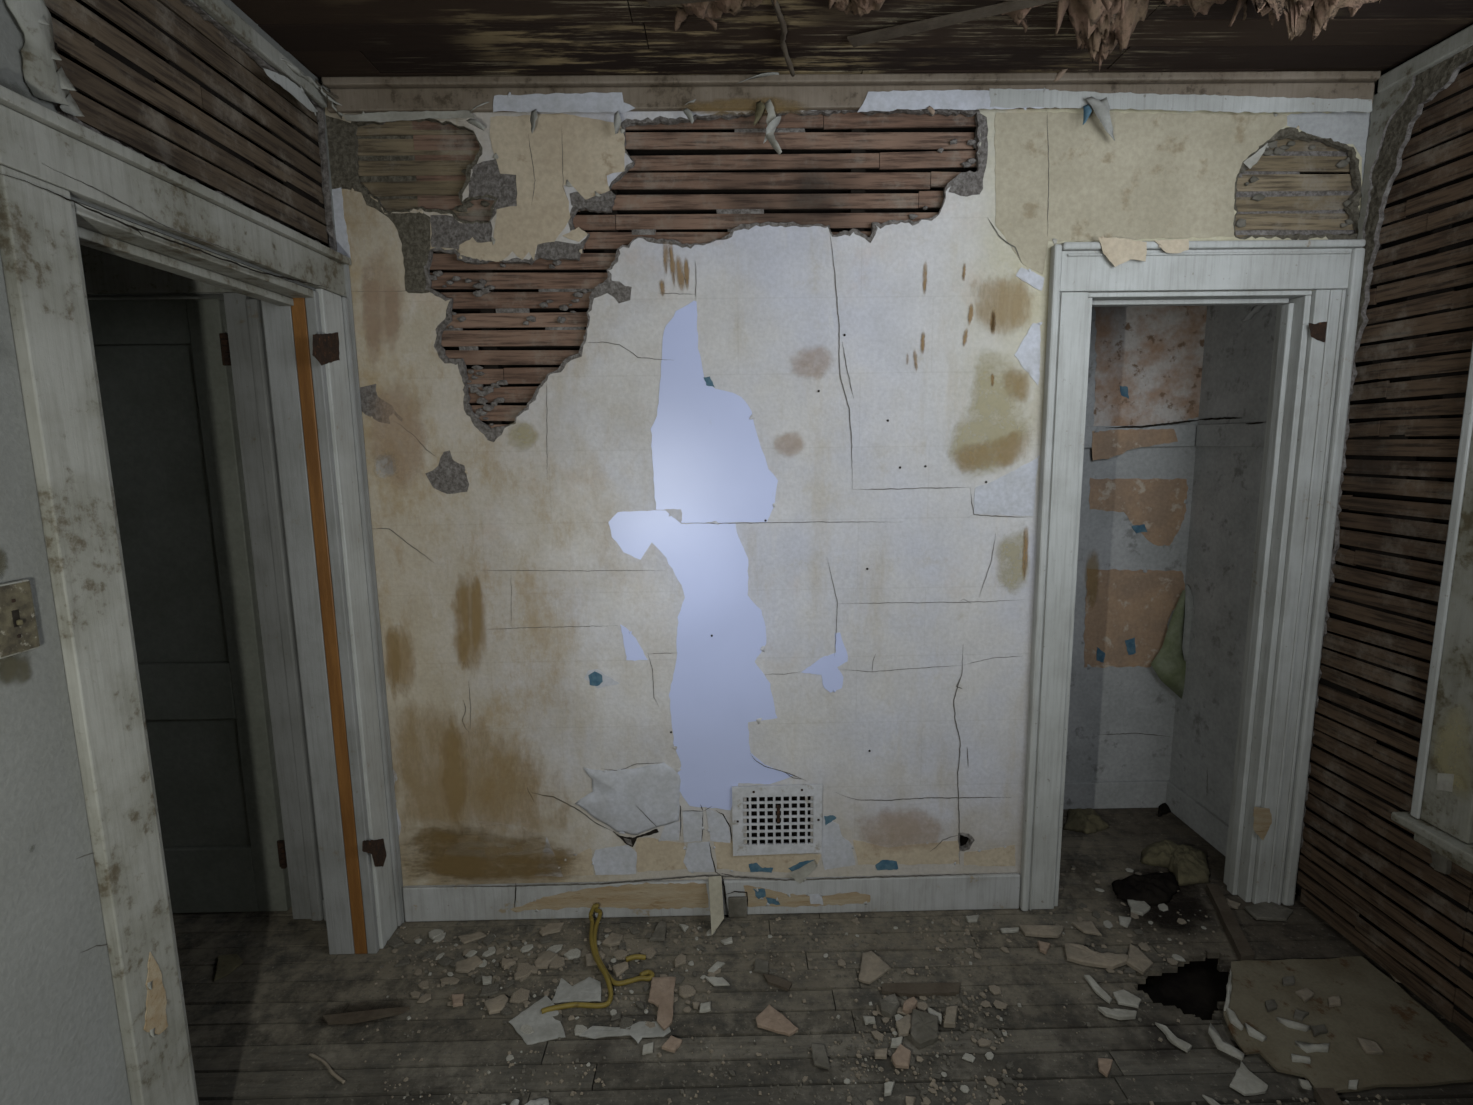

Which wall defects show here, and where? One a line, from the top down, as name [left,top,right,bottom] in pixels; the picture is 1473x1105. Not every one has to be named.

flaking render [5,0,1372,442]
flaking render [425,450,469,494]
leakage [954,369,1024,469]
flaking render [1089,306,1207,547]
leakage [1,658,30,682]
crack [406,226,1018,908]
flaking render [1083,568,1185,669]
leakage [403,724,570,882]